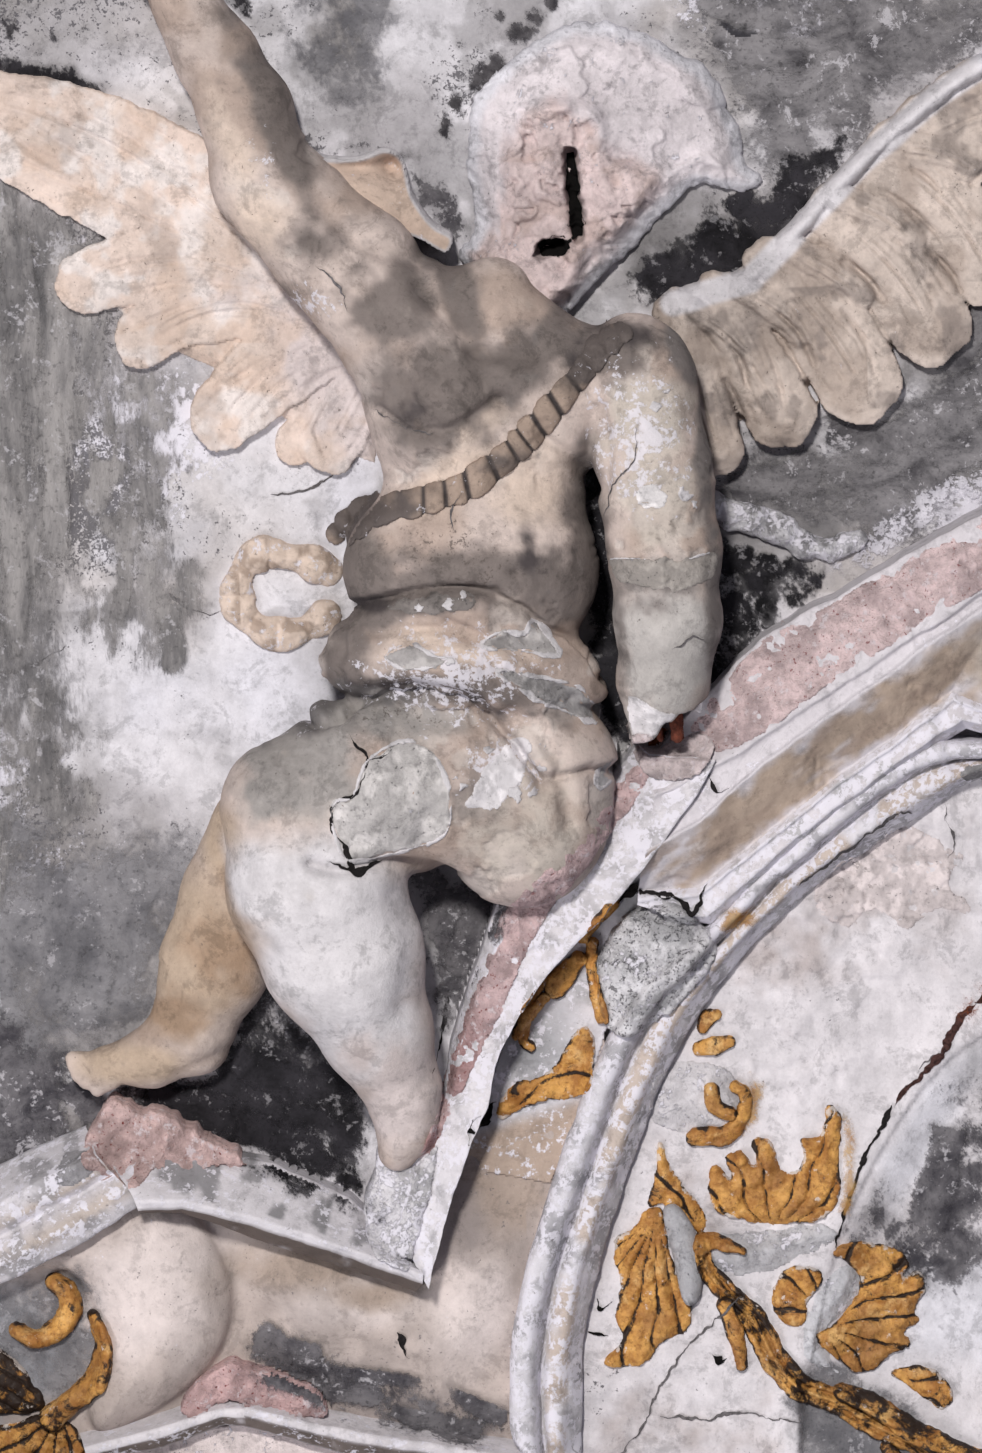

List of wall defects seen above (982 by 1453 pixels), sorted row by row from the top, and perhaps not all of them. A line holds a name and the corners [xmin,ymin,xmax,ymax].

damp [2,18,19,39]
damp [287,0,396,107]
peeling [387,590,476,615]
peeling [384,642,455,671]
crack [329,736,399,877]
peeling [330,737,547,864]
spalling [419,518,982,1158]
crack [799,804,956,886]
spalling [81,1091,247,1189]
crack [835,995,982,1248]
damp [908,1125,967,1235]